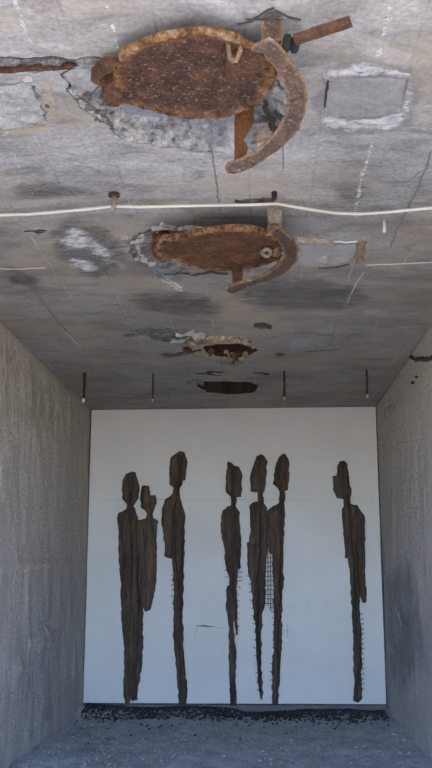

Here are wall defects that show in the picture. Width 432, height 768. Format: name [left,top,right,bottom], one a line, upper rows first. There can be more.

spalling [62,64,235,155]
spalling [244,81,287,154]
leakage [51,222,124,278]
spalling [120,223,229,281]